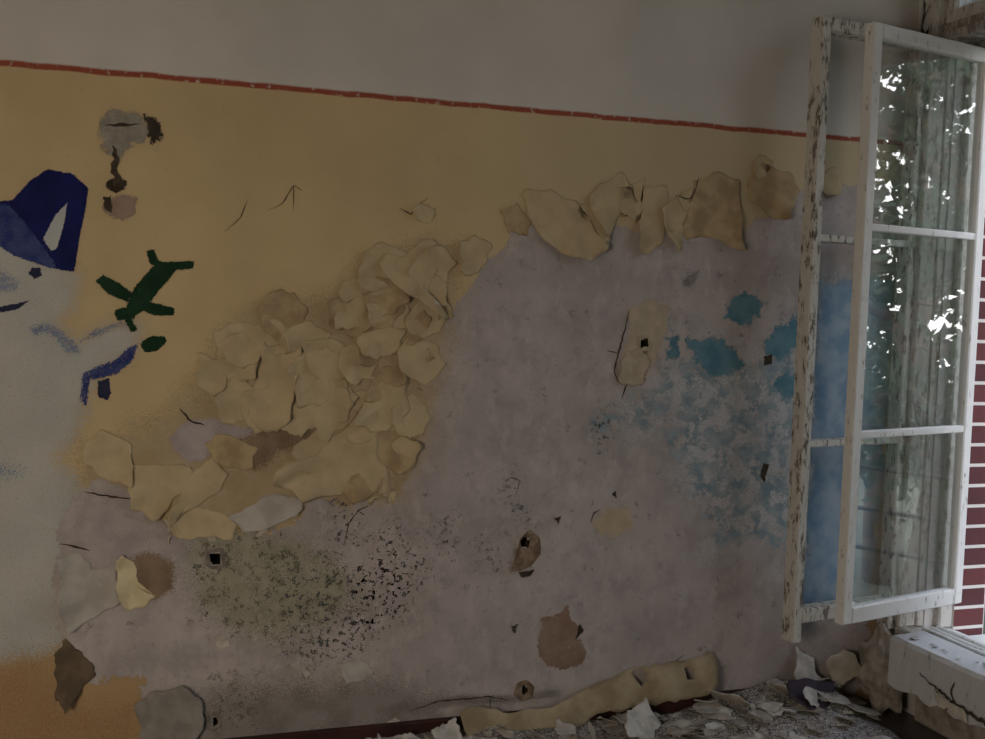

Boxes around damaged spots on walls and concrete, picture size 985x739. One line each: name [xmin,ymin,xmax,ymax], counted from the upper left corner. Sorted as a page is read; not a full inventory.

spalling [97,107,166,222]
leakage [130,283,545,739]
peeling [51,154,904,739]
crack [920,673,985,726]